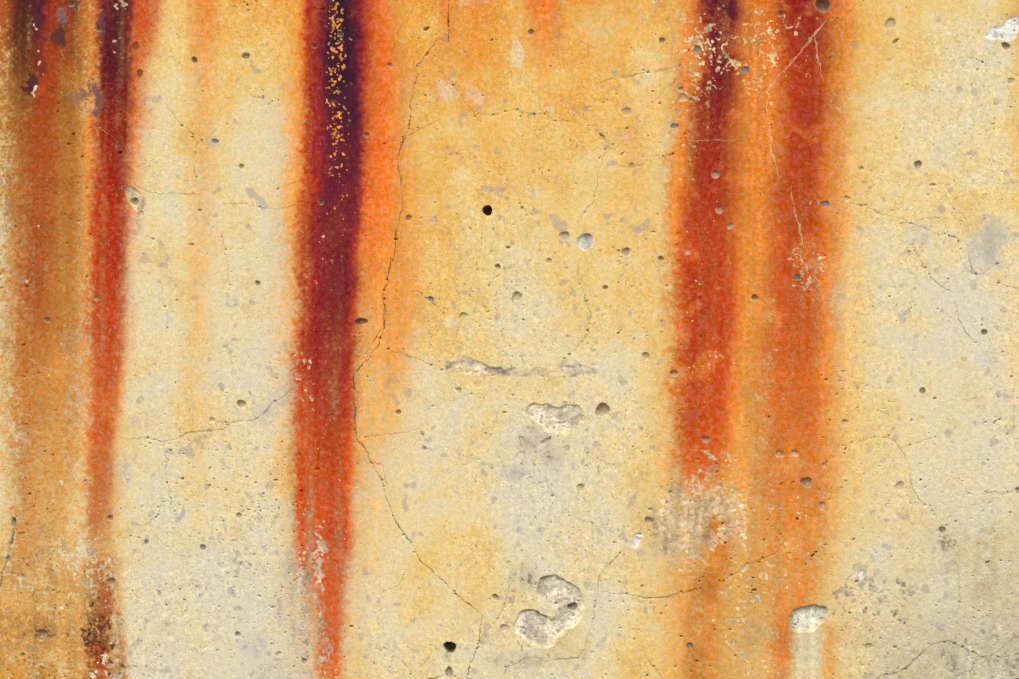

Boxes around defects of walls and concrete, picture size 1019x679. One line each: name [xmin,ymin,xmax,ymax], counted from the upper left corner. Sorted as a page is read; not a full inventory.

spalling [984,15,1019,43]
corrosion [0,0,228,679]
corrosion [257,0,499,679]
crack [117,0,779,679]
spalling [517,402,587,493]
corrosion [518,0,892,679]
spalling [490,569,586,664]
peeling [630,448,927,678]
peeling [923,614,1019,679]